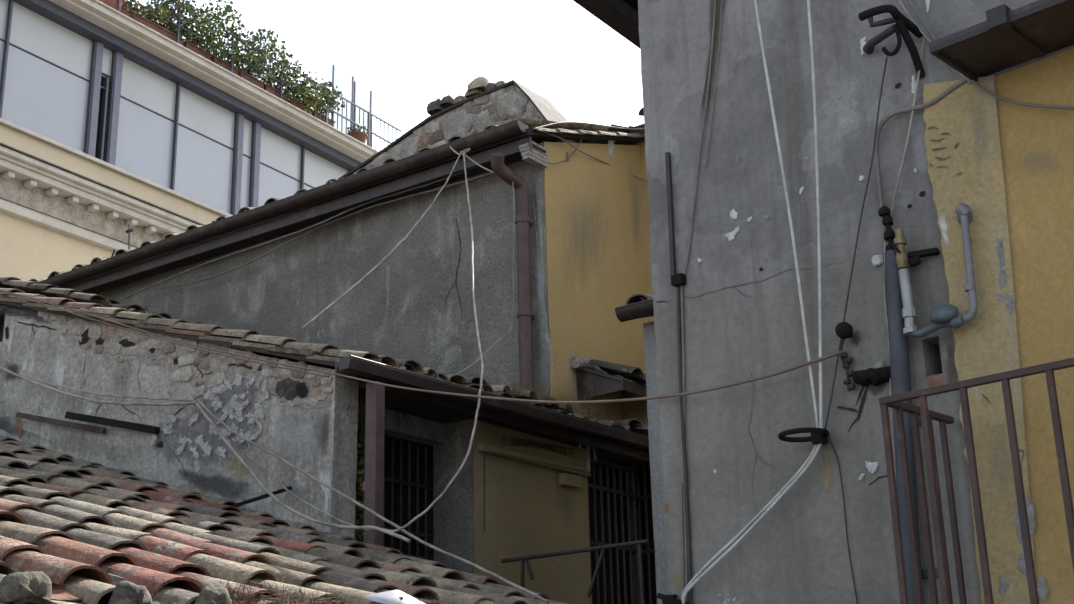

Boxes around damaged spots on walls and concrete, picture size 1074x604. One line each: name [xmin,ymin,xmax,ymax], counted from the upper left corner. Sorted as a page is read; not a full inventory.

crack [445,219,462,345]
peeling [724,209,770,241]
flaking render [38,311,333,472]
peeling [1014,495,1048,601]